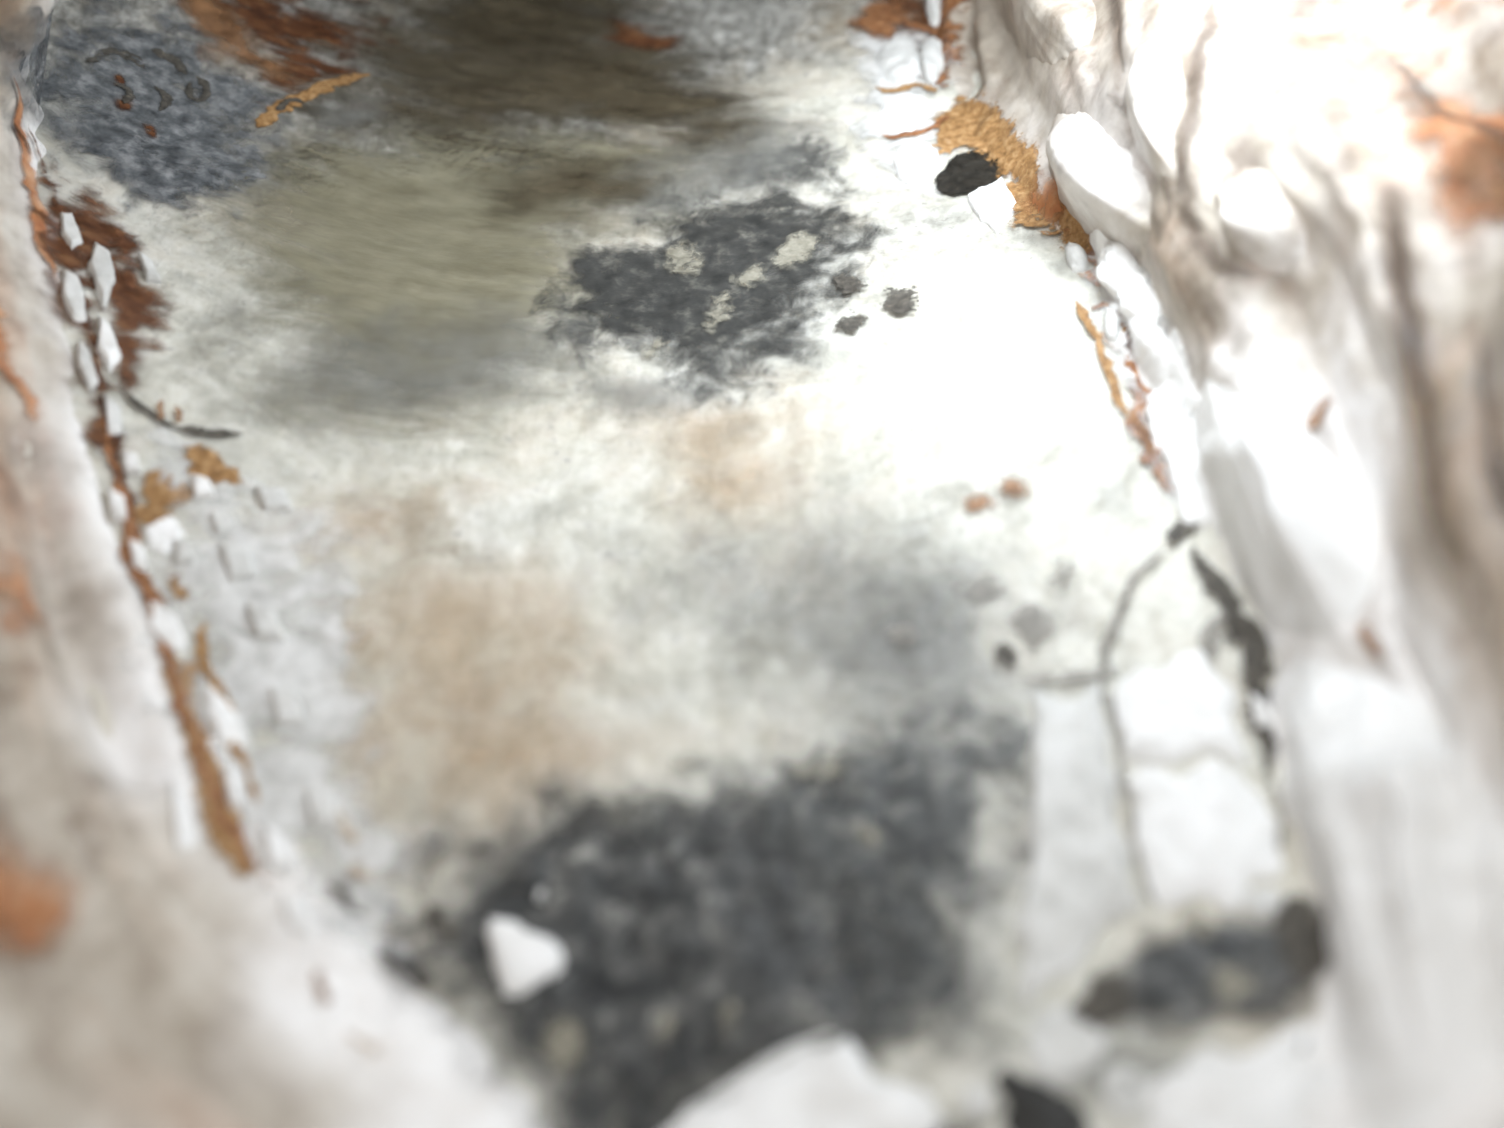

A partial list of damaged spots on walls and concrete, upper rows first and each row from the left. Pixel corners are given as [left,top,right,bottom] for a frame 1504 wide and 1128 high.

corrosion [13,76,57,276]
corrosion [115,75,132,110]
corrosion [179,0,389,127]
damp [11,0,881,414]
peeling [967,176,1016,233]
corrosion [0,308,38,421]
damp [79,306,314,938]
crack [1024,520,1287,907]
damp [392,717,1034,1128]
damp [1070,894,1332,1033]